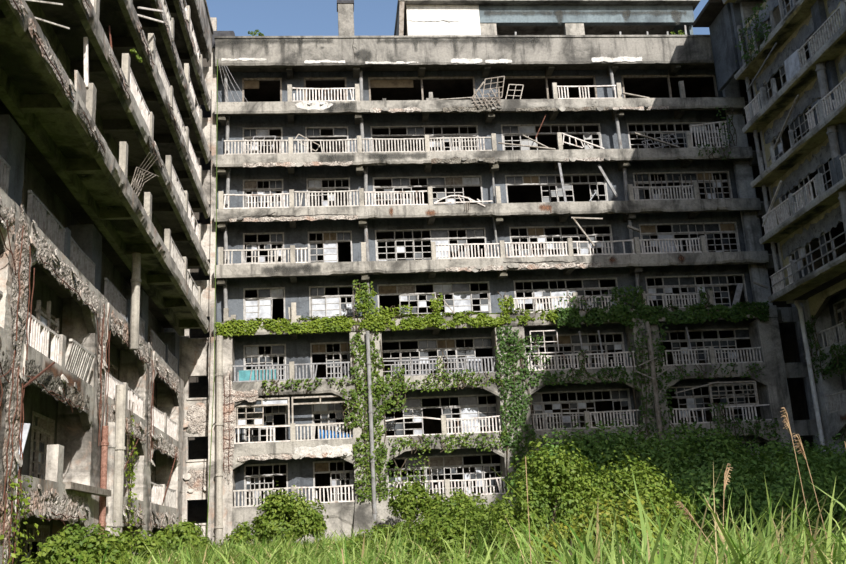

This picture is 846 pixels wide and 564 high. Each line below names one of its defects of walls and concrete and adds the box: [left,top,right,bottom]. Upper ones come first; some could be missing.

spalling [149,136,164,171]
spalling [0,196,180,564]
spalling [223,370,353,484]